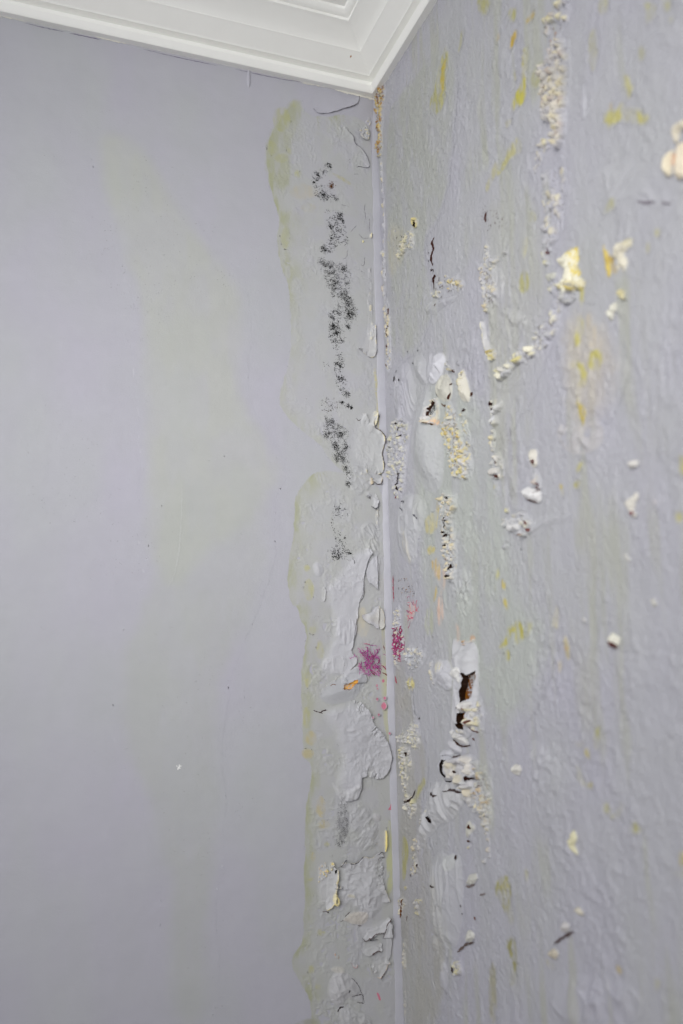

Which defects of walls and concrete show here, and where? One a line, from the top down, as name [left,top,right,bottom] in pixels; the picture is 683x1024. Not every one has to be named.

leakage [89,126,286,1024]
peeling [318,548,385,679]
peeling [347,411,386,536]
leakage [262,0,627,1024]
peeling [316,830,393,980]